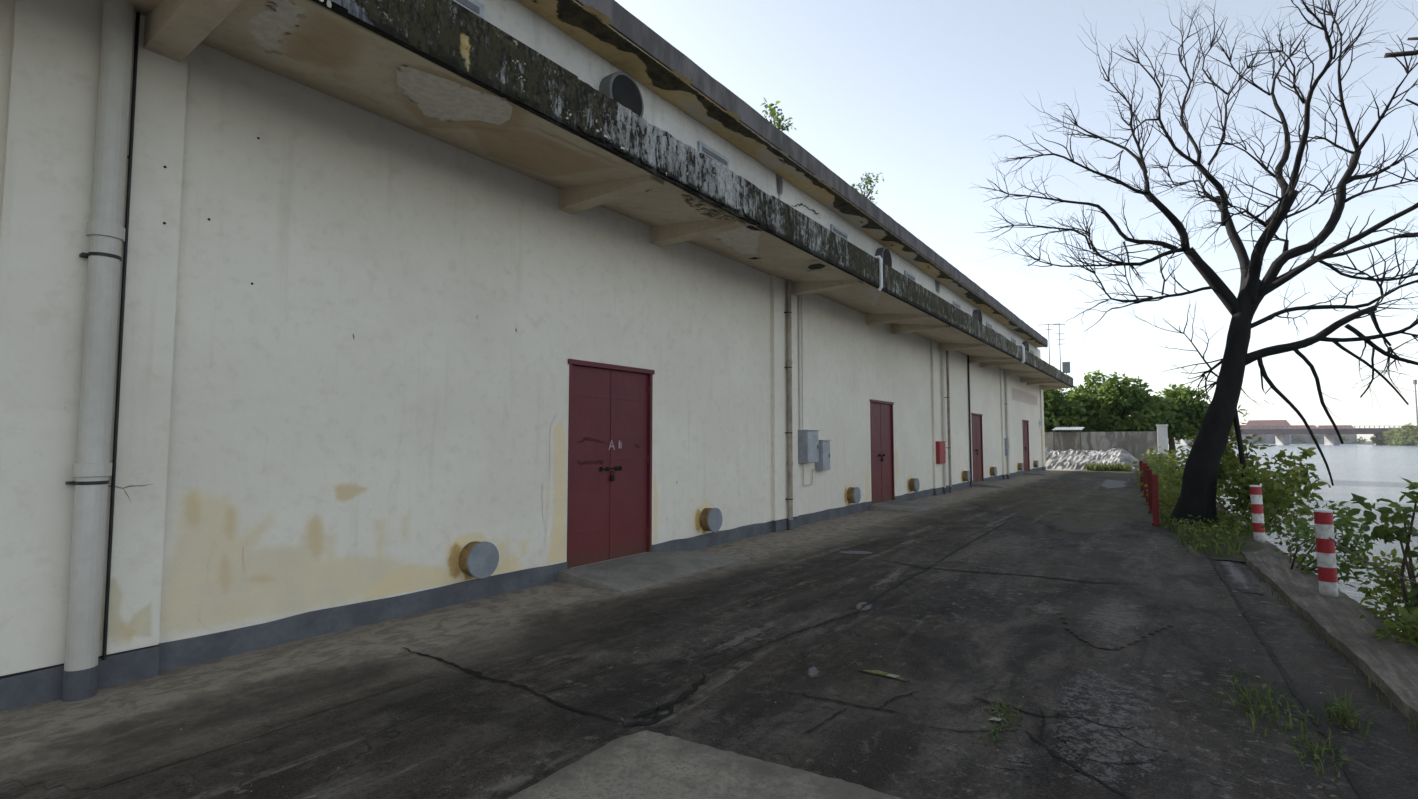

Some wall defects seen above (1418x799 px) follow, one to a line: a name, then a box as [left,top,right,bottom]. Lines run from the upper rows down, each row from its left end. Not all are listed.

peeling [389,55,530,126]
peeling [562,96,785,260]
damp [524,0,1047,347]
damp [99,469,441,655]
damp [480,411,567,574]
crack [620,673,706,727]